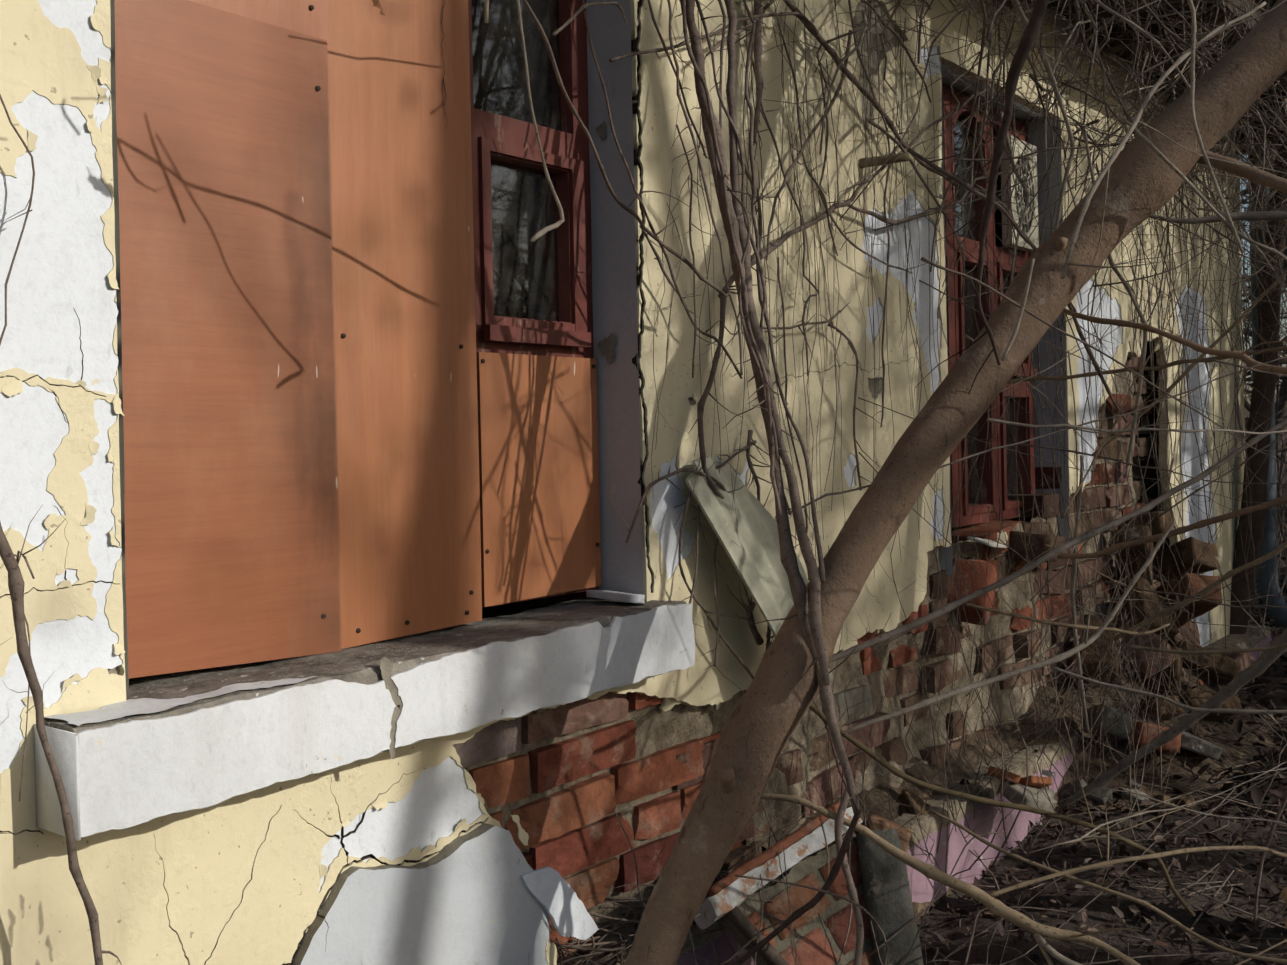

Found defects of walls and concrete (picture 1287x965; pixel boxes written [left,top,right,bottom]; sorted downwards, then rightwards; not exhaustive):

peeling [0,0,125,773]
peeling [862,190,941,392]
peeling [1176,285,1216,544]
spalling [712,278,1165,884]
peeling [1192,611,1212,647]
crack [169,657,484,965]
spalling [319,690,747,959]